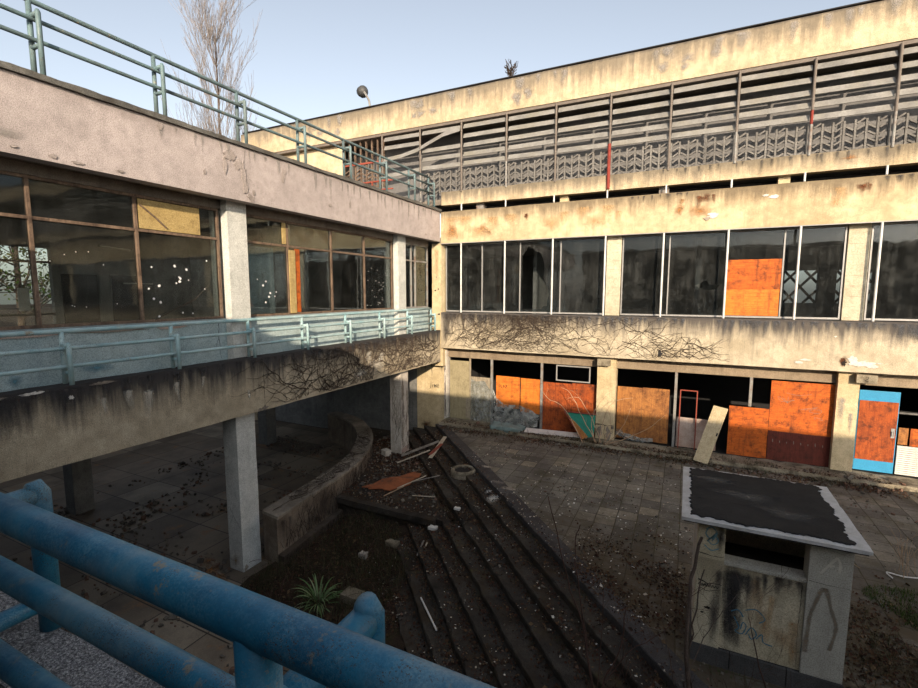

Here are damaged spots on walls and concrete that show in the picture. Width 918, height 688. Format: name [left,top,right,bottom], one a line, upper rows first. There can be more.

spalling [841,356,882,369]
leakage [711,571,803,640]